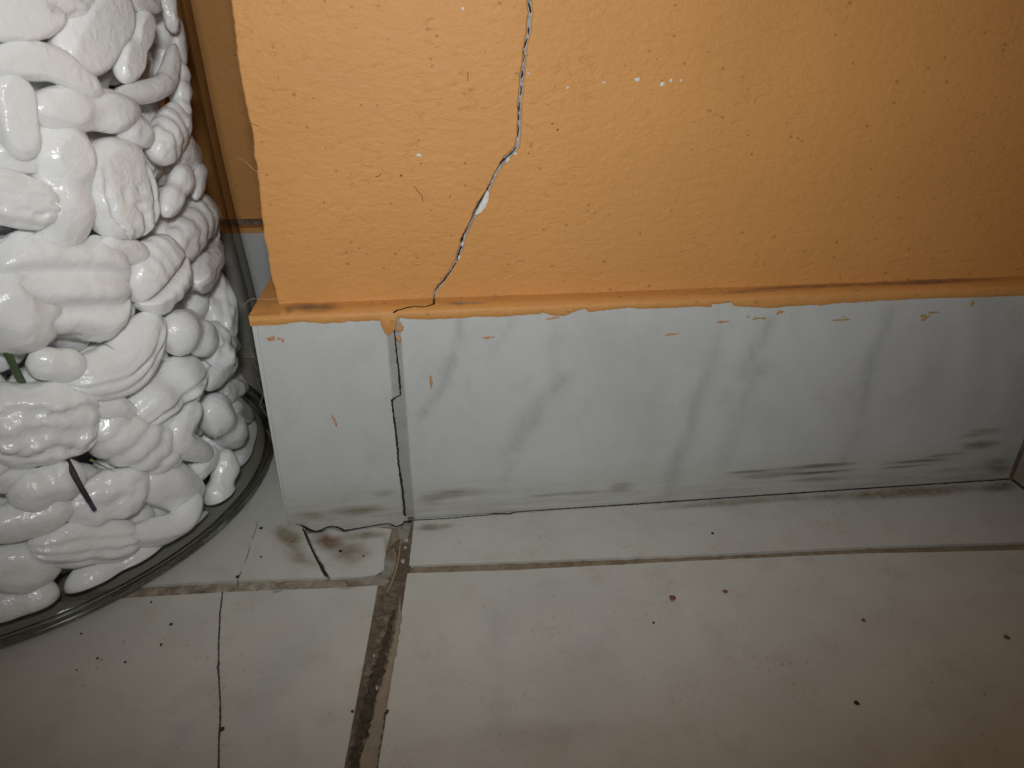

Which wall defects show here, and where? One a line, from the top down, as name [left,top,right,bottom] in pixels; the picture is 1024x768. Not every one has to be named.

crack [297,0,1008,577]
crack [217,522,258,768]